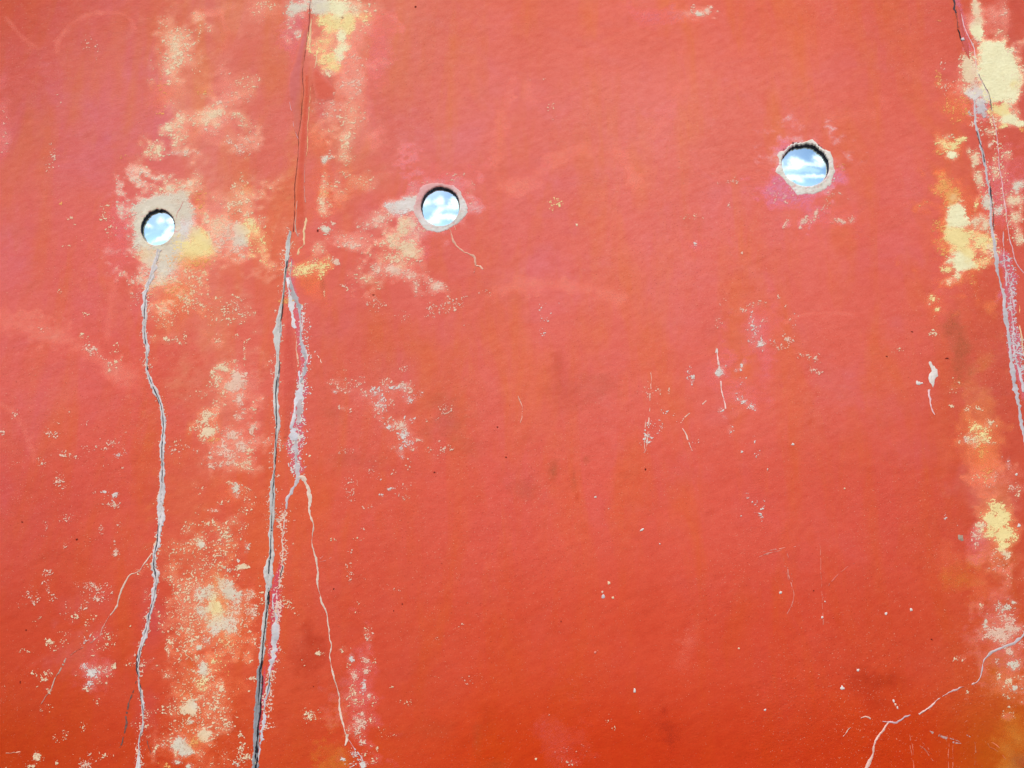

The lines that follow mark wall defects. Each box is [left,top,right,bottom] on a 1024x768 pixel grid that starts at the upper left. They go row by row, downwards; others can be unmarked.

crack [41,249,168,768]
spalling [100,0,485,768]
crack [252,5,363,768]
crack [846,633,1024,768]
peeling [917,0,1024,311]
peeling [948,377,1021,586]
crack [953,0,1024,442]
peeling [979,600,1024,717]